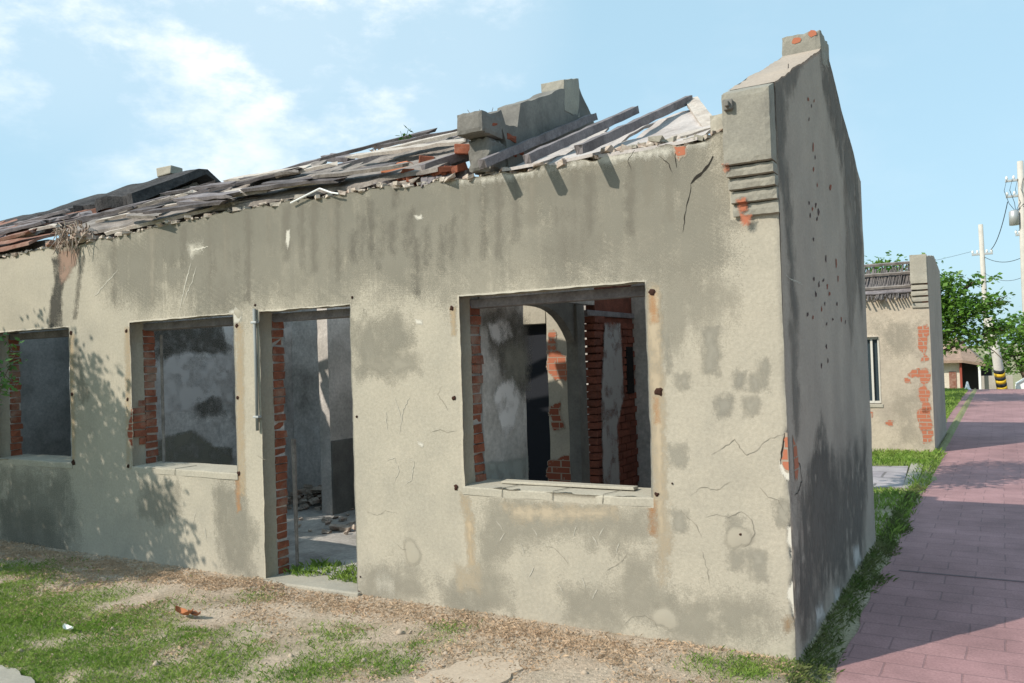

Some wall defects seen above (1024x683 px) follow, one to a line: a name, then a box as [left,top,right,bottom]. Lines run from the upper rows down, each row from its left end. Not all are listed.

peeling [445,141,710,188]
crack [659,145,713,229]
flaking render [736,197,752,226]
leakage [47,133,772,422]
peeling [127,307,242,465]
rust [646,281,675,587]
crack [711,433,802,512]
flaking render [779,432,799,481]
flaking render [904,324,933,444]
leakage [358,406,871,653]
crack [682,482,755,584]